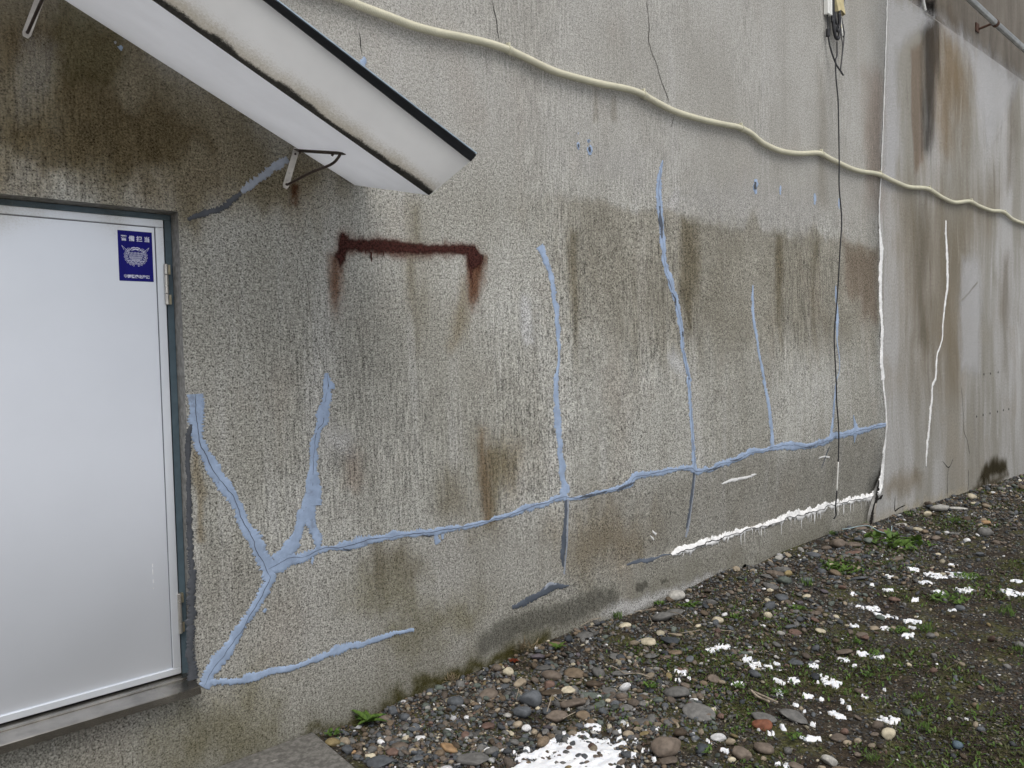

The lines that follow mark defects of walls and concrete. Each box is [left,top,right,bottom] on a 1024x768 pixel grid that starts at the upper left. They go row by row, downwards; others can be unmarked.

crack [646,2,674,126]
leakage [883,0,939,184]
leakage [962,35,1016,141]
corrosion [334,233,484,297]
crack [926,220,978,496]
leakage [961,261,980,370]
crack [187,156,886,690]
leakage [980,460,1006,482]